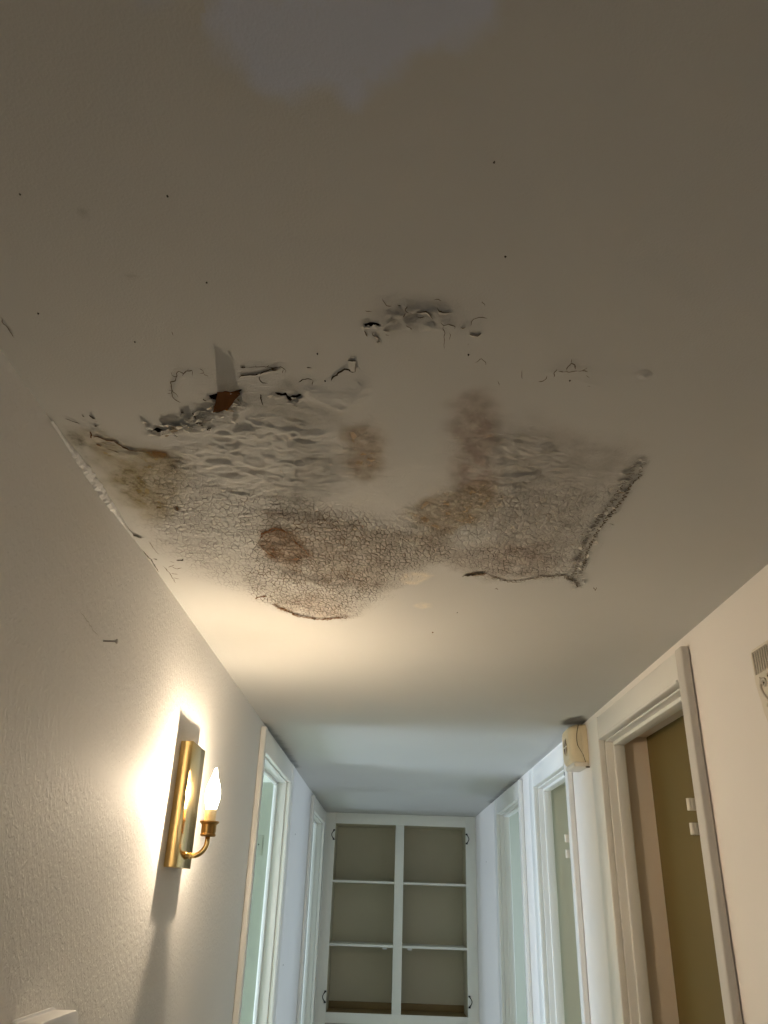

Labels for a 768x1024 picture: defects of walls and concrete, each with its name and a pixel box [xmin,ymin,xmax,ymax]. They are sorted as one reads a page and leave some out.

crack [67,415,143,453]
crack [168,369,212,431]
peeling [141,395,243,438]
crack [133,535,183,582]
crack [242,508,449,621]
crack [466,548,597,591]